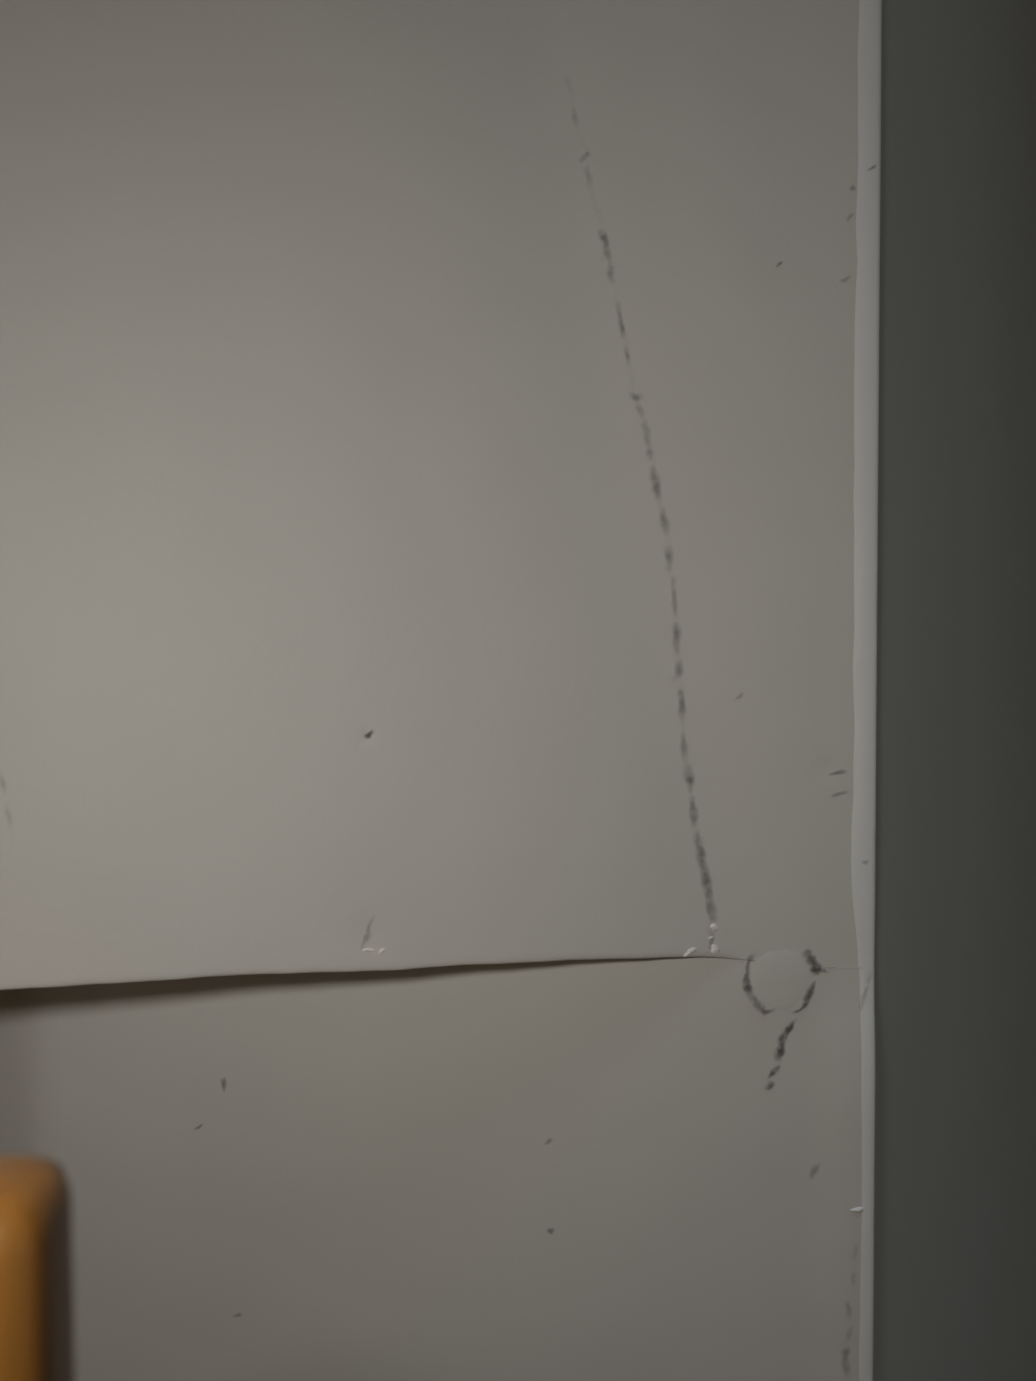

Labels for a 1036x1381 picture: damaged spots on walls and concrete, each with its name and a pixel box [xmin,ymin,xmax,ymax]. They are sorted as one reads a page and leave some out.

peeling [684,923,720,957]
crack [770,956,820,1086]